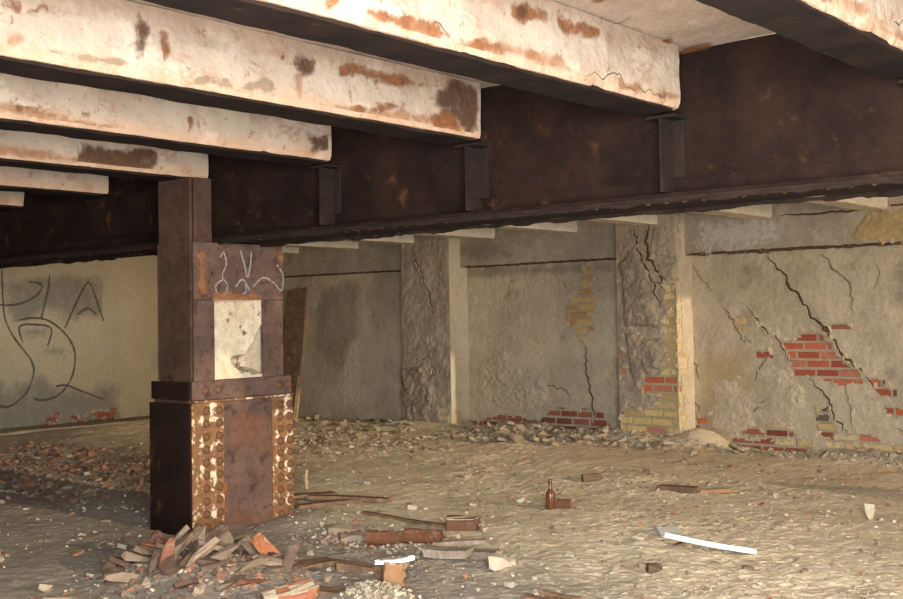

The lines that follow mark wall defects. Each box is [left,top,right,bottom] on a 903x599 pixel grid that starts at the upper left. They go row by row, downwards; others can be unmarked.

corrosion [368,10,449,38]
corrosion [512,3,546,24]
corrosion [558,19,600,38]
corrosion [339,63,422,86]
corrosion [337,79,478,133]
crack [585,70,666,102]
peeling [844,205,903,246]
spalling [470,281,709,435]
crack [692,266,791,436]
crack [757,252,880,437]
spalling [779,319,903,421]
spalling [718,403,903,455]